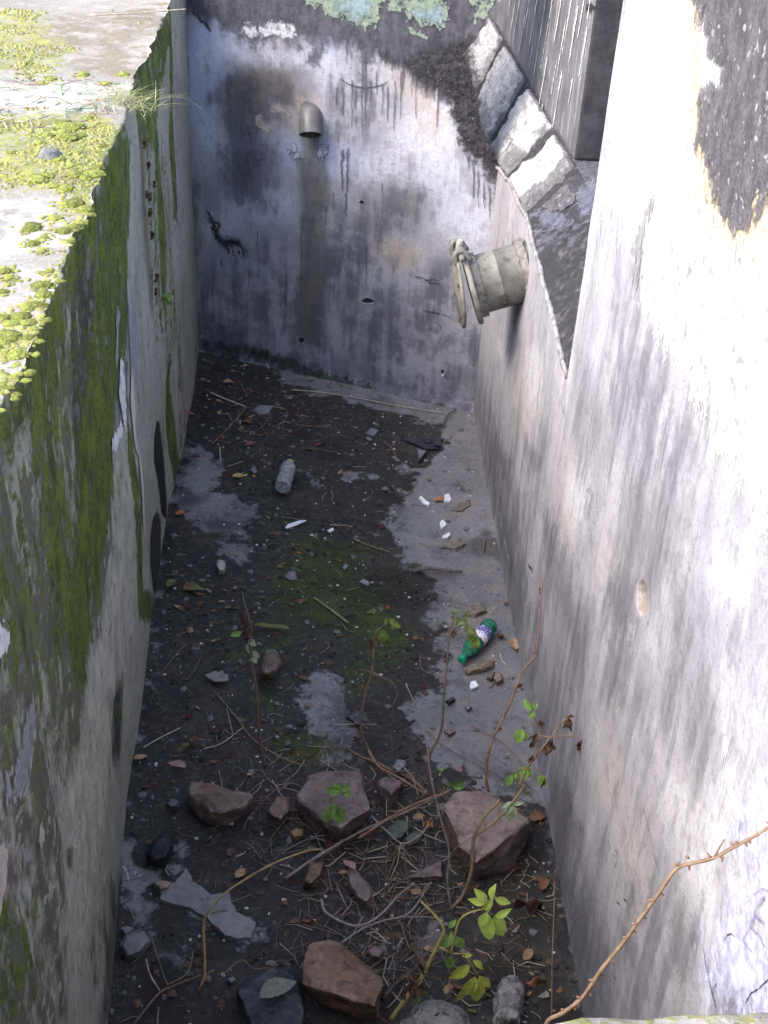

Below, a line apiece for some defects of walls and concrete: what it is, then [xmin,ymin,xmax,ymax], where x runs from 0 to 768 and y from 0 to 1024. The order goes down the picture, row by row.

water stain [298,138,329,343]
water stain [340,150,349,210]
water stain [187,0,590,132]
peeling [686,0,768,256]